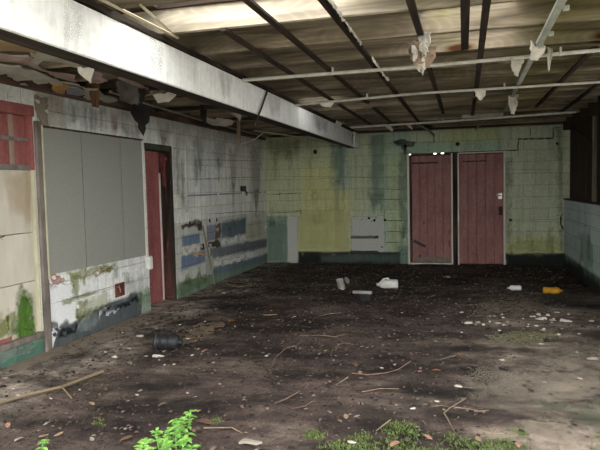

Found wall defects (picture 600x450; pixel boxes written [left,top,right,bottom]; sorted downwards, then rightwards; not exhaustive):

crack [501,127,559,170]
peeling [181,218,254,276]
flaking render [50,274,79,346]
peeling [99,296,139,317]